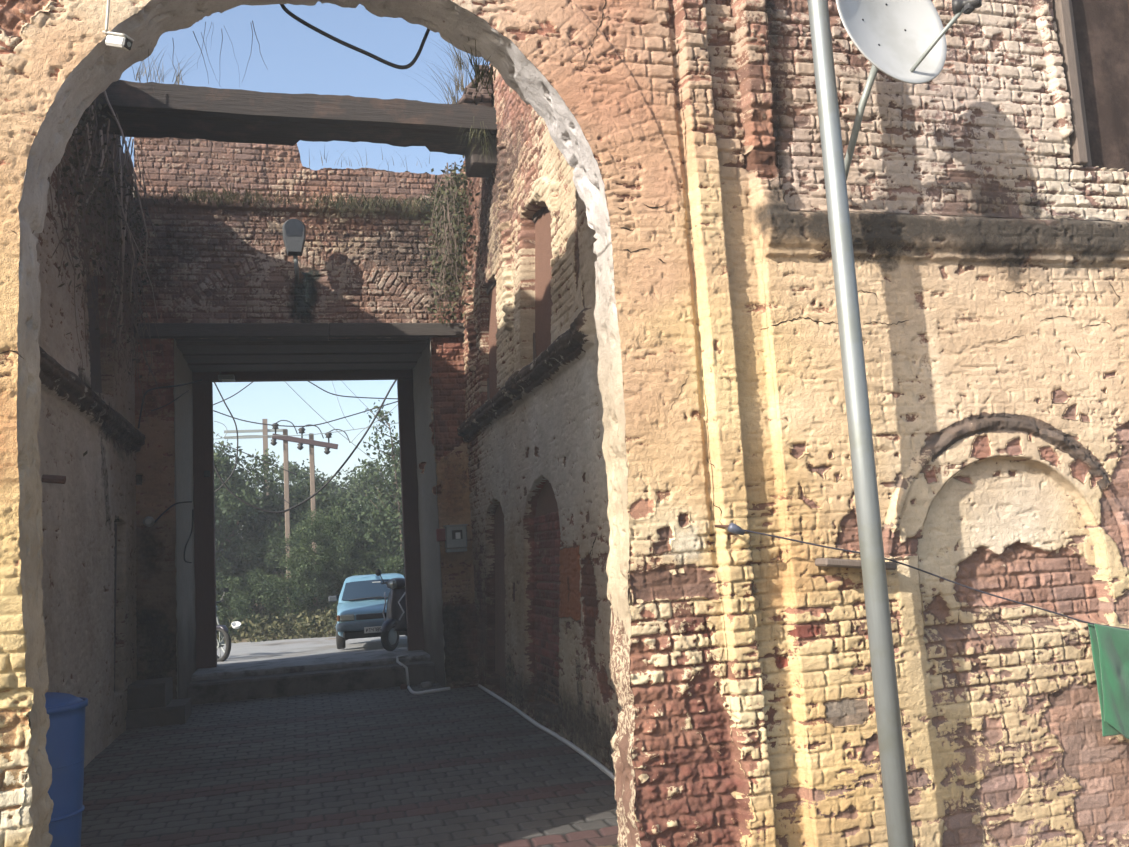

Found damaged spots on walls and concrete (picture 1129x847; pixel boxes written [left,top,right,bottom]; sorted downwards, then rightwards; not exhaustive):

leakage [755,185,830,244]
leakage [849,197,1129,274]
peeling [1035,388,1092,422]
peeling [970,420,1129,568]
peeling [627,497,721,607]
spalling [926,539,1129,626]
spalling [776,655,790,670]
spalling [783,624,821,639]
spalling [633,617,756,847]
spalling [906,766,933,789]
spalling [941,763,1030,847]
spalling [1024,677,1129,846]